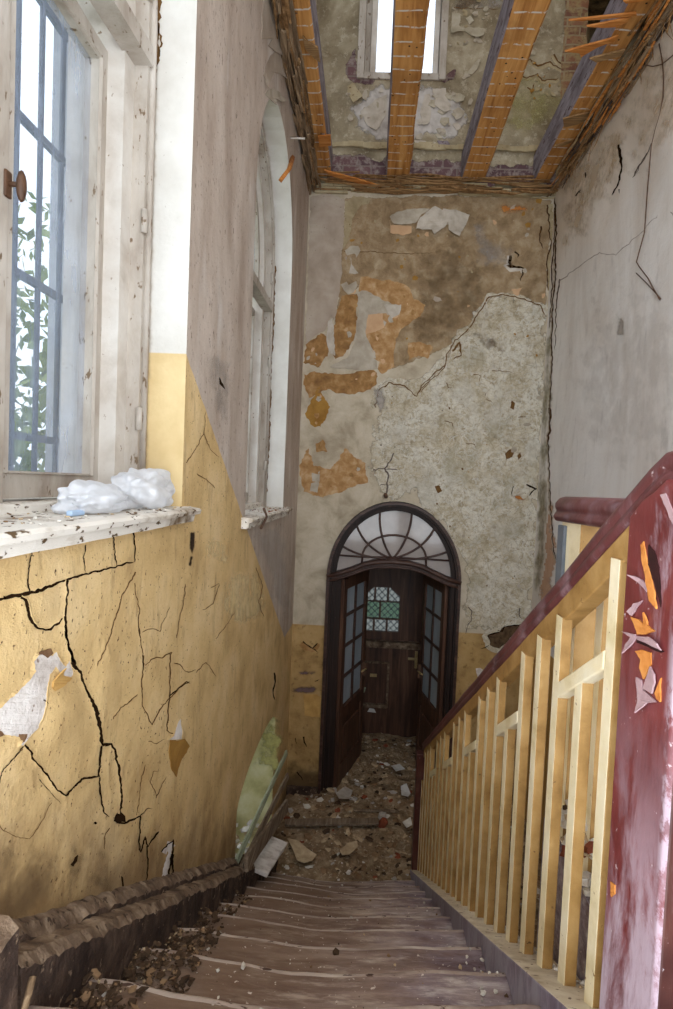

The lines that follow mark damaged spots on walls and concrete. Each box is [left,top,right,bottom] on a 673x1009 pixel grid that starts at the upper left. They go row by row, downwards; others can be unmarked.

flaking render [263,0,673,376]
crack [612,144,651,195]
spalling [505,447,521,460]
spalling [0,648,74,748]
crack [0,533,264,880]
spalling [166,716,190,777]